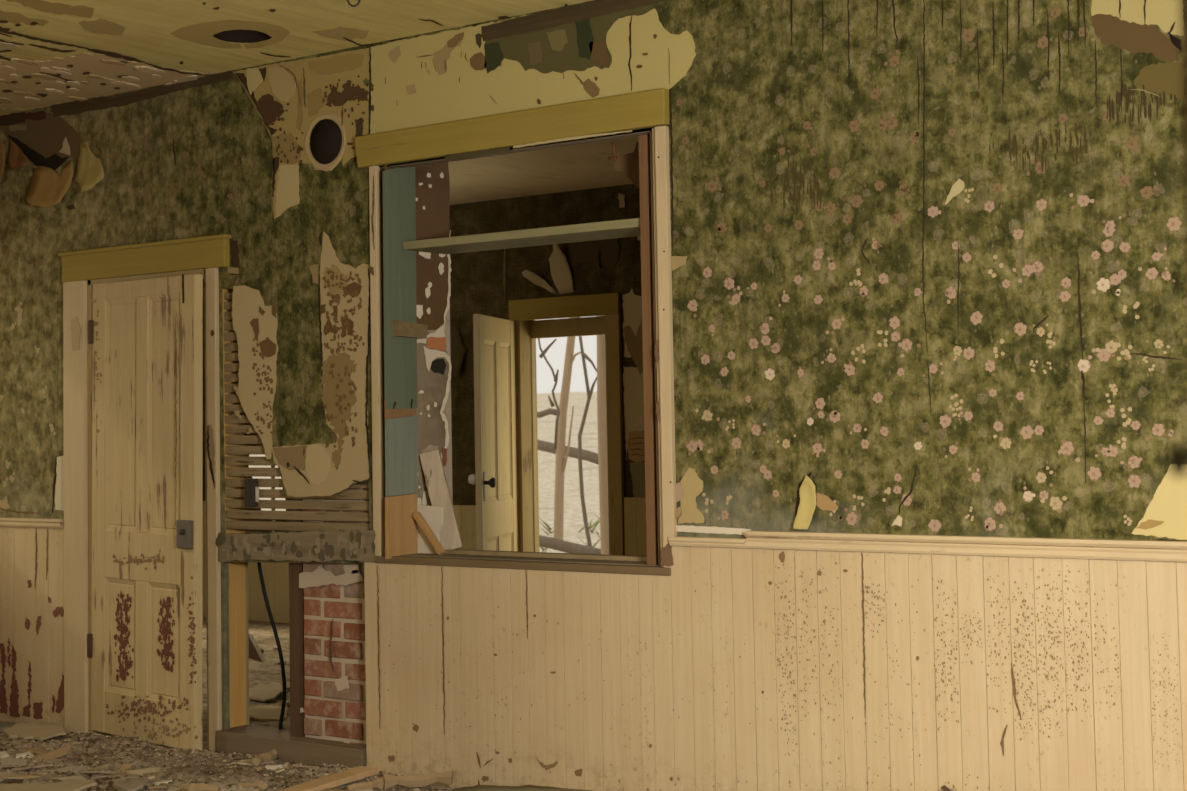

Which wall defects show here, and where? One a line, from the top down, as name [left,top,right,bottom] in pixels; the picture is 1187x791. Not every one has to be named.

water stain [0,0,125,35]
flaking render [233,8,696,219]
water stain [992,3,1004,98]
water stain [1018,0,1061,93]
water stain [989,120,1091,173]
water stain [1095,43,1177,131]
flaking render [1091,0,1183,50]
peeling [228,232,374,497]
peeling [0,638,64,719]
peeling [114,592,134,682]
peeling [106,695,198,751]
peeling [157,576,197,684]